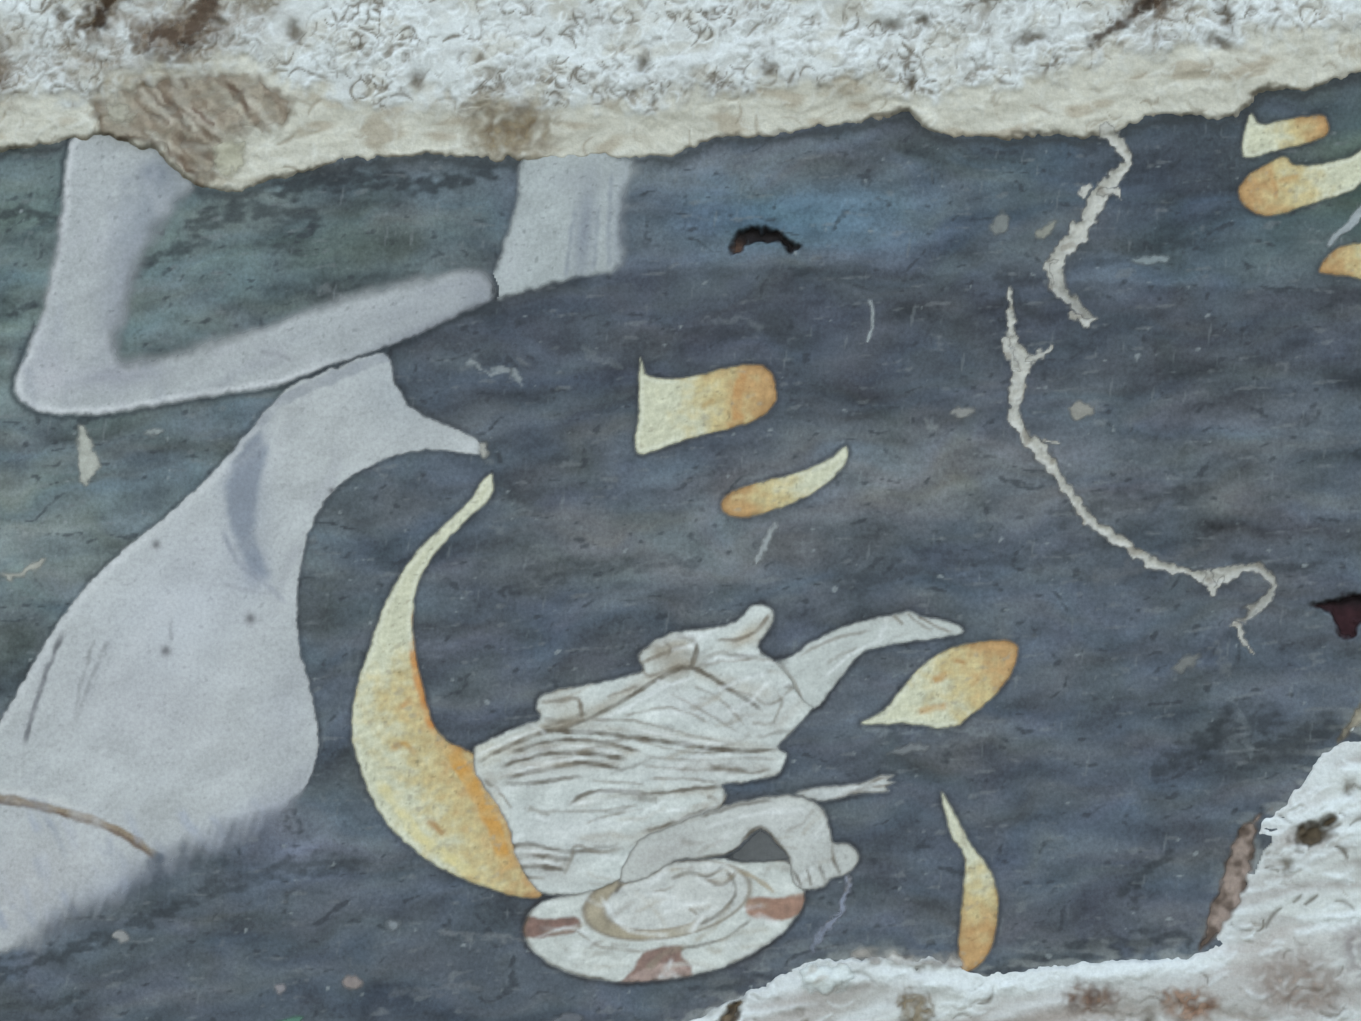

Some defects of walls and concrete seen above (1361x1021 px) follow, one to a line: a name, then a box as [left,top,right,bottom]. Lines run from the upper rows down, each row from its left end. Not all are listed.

water stain [94,0,114,27]
spalling [92,74,291,188]
peeling [1133,255,1169,264]
crack [1001,122,1277,653]
peeling [1070,401,1093,420]
peeling [78,426,100,485]
peeling [755,523,778,565]
spalling [1200,815,1260,949]
peeling [112,931,129,942]
spalling [852,949,962,967]
peeling [343,976,362,989]
spalling [705,996,744,1021]